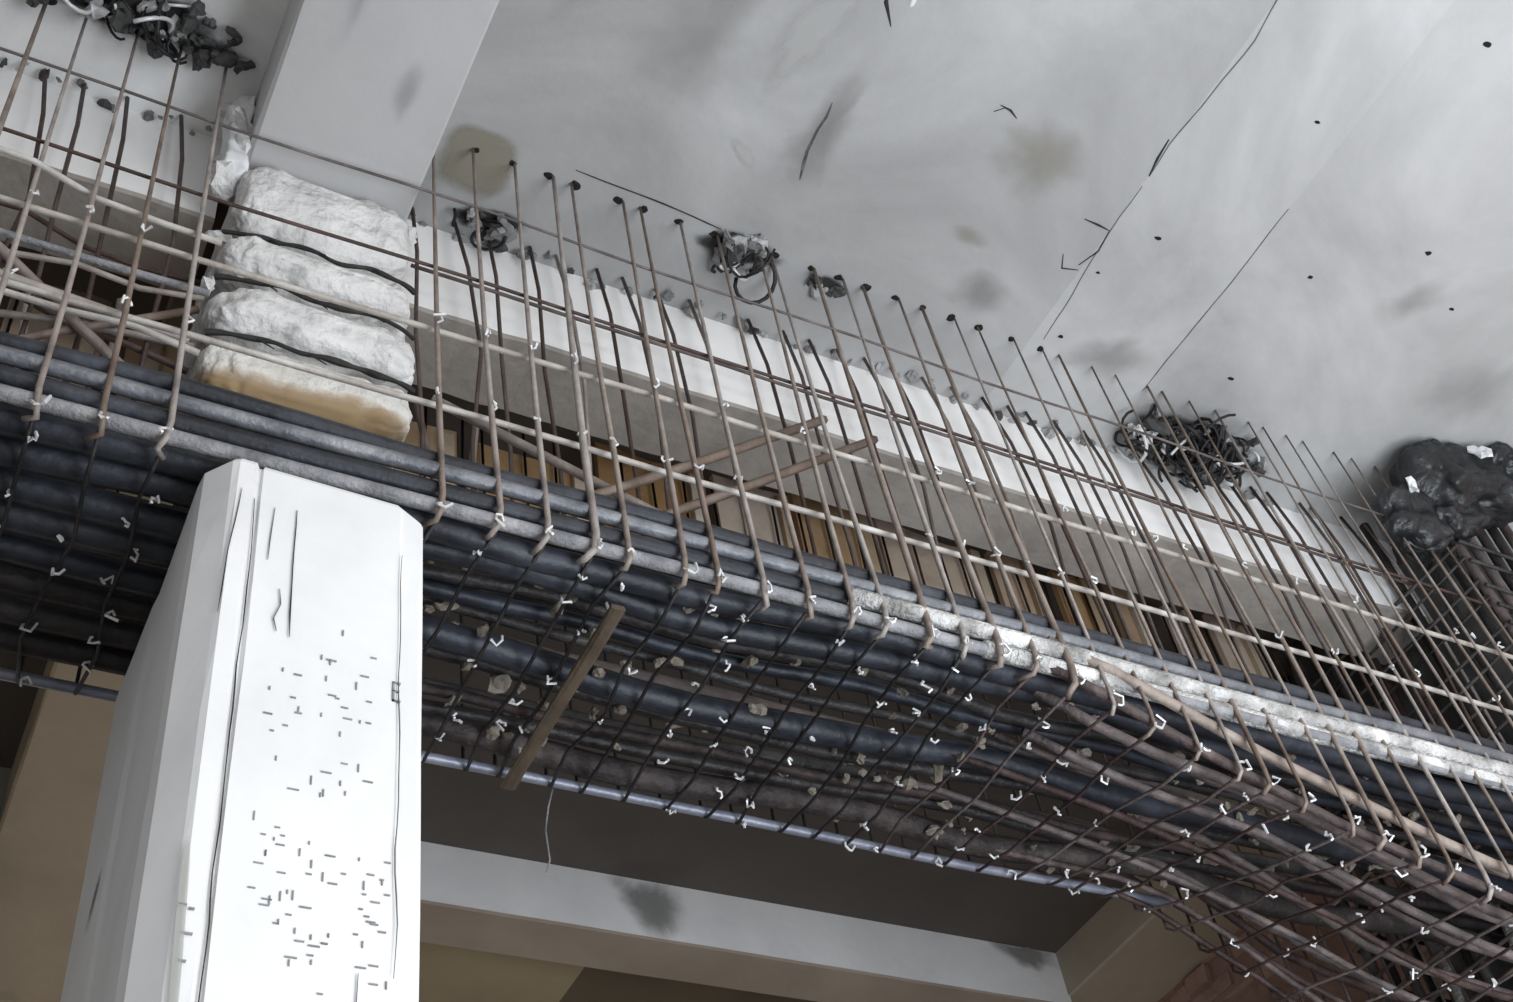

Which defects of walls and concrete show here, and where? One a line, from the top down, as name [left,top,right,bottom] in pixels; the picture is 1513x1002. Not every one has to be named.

spalling [26,0,256,75]
spalling [0,58,115,113]
spalling [143,110,174,121]
spalling [451,207,551,260]
spalling [181,95,428,442]
spalling [653,289,704,319]
spalling [699,228,853,366]
spalling [875,362,1274,506]
leakage [629,889,672,929]